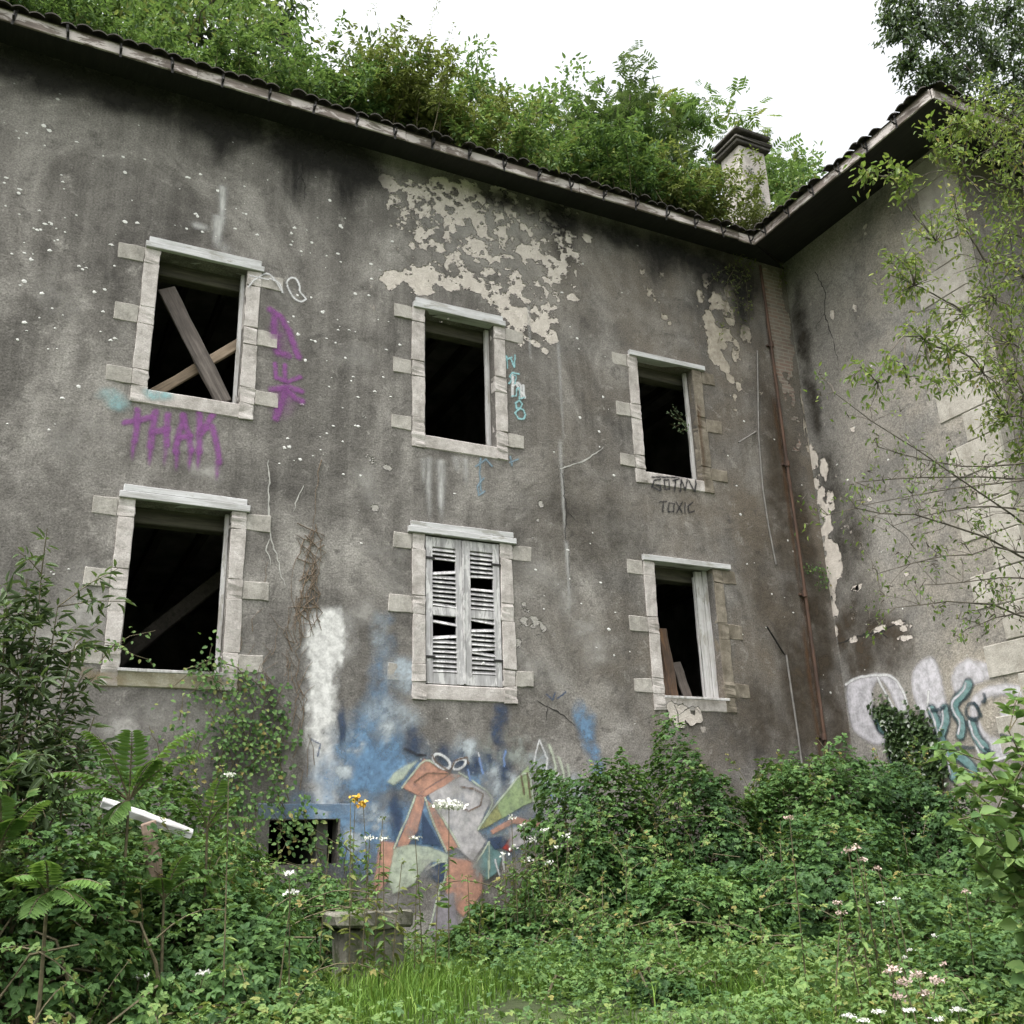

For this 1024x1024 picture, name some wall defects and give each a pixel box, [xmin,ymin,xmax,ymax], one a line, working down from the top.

flaking render [354,167,593,355]
flaking render [694,274,752,422]
water stain [793,310,809,362]
crack [815,272,838,359]
water stain [804,380,821,432]
water stain [824,455,839,503]
flaking render [762,268,913,649]
water stain [305,608,345,819]
flaking render [666,700,706,732]